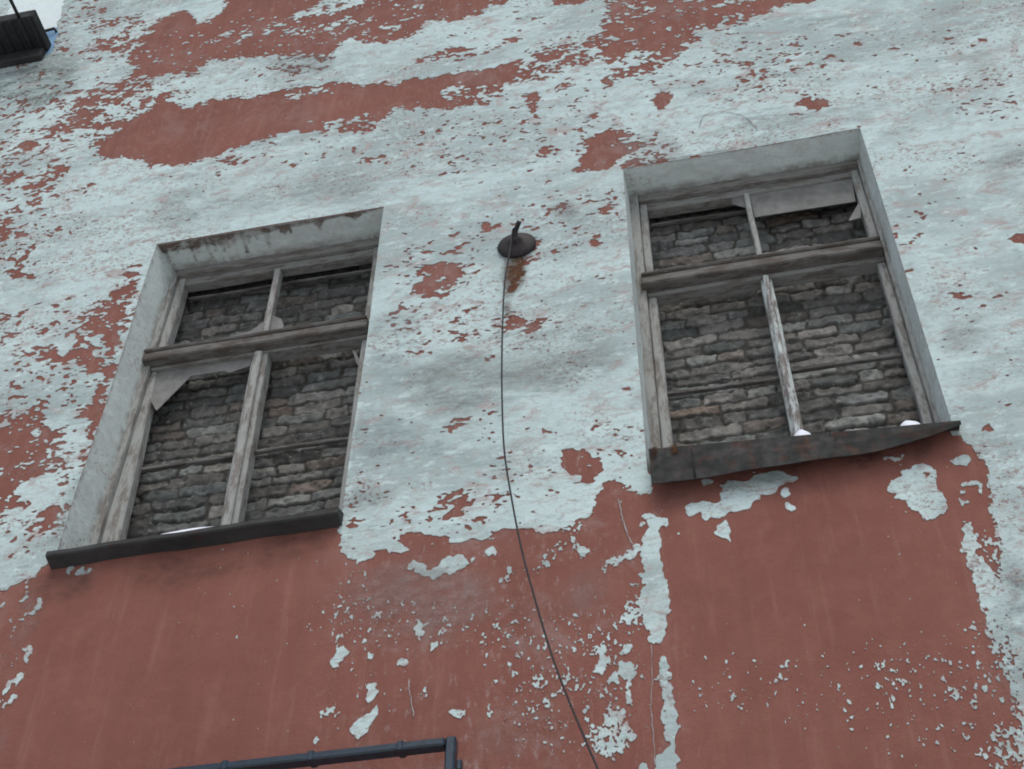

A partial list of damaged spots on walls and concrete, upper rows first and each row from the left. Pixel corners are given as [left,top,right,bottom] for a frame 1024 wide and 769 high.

peeling [0,0,11,16]
peeling [950,454,971,466]
peeling [685,470,798,542]
peeling [883,454,948,532]
peeling [407,554,475,581]
peeling [322,569,382,671]
peeling [375,597,464,652]
peeling [462,513,671,761]
peeling [320,674,390,739]
peeling [449,709,466,719]
peeling [639,655,681,769]
peeling [873,652,924,709]